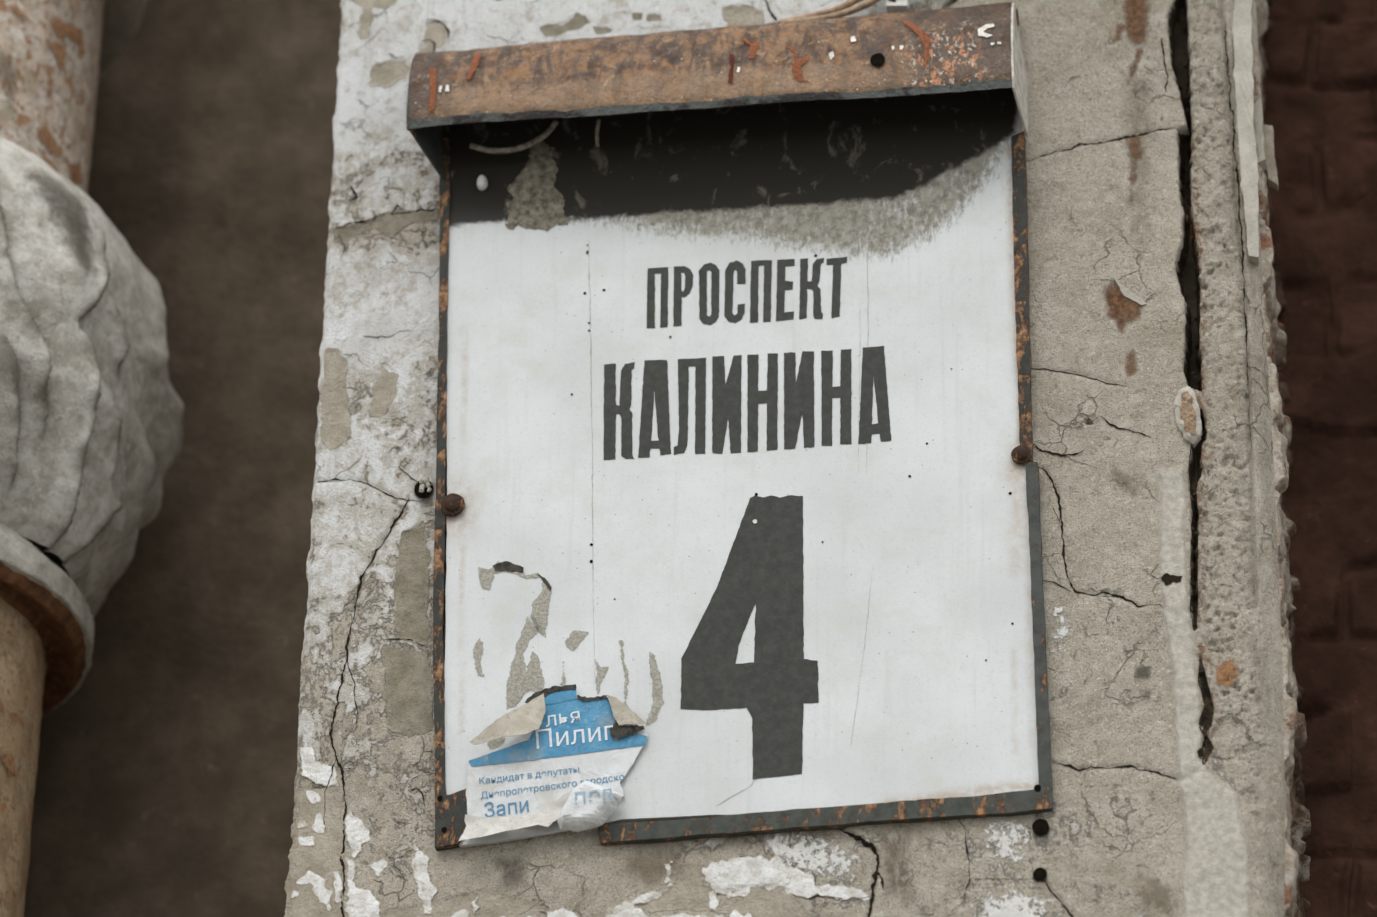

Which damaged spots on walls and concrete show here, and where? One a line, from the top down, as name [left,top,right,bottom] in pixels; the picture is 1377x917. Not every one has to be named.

peeling [351,0,397,39]
peeling [540,12,612,36]
rust [1113,0,1148,76]
crack [1224,20,1252,454]
rust [1106,276,1147,331]
crack [1026,0,1214,780]
rust [1126,352,1136,376]
crack [318,467,418,917]
peeling [284,746,389,917]
peeling [409,839,437,915]
peeling [605,834,870,917]
crack [810,830,884,917]